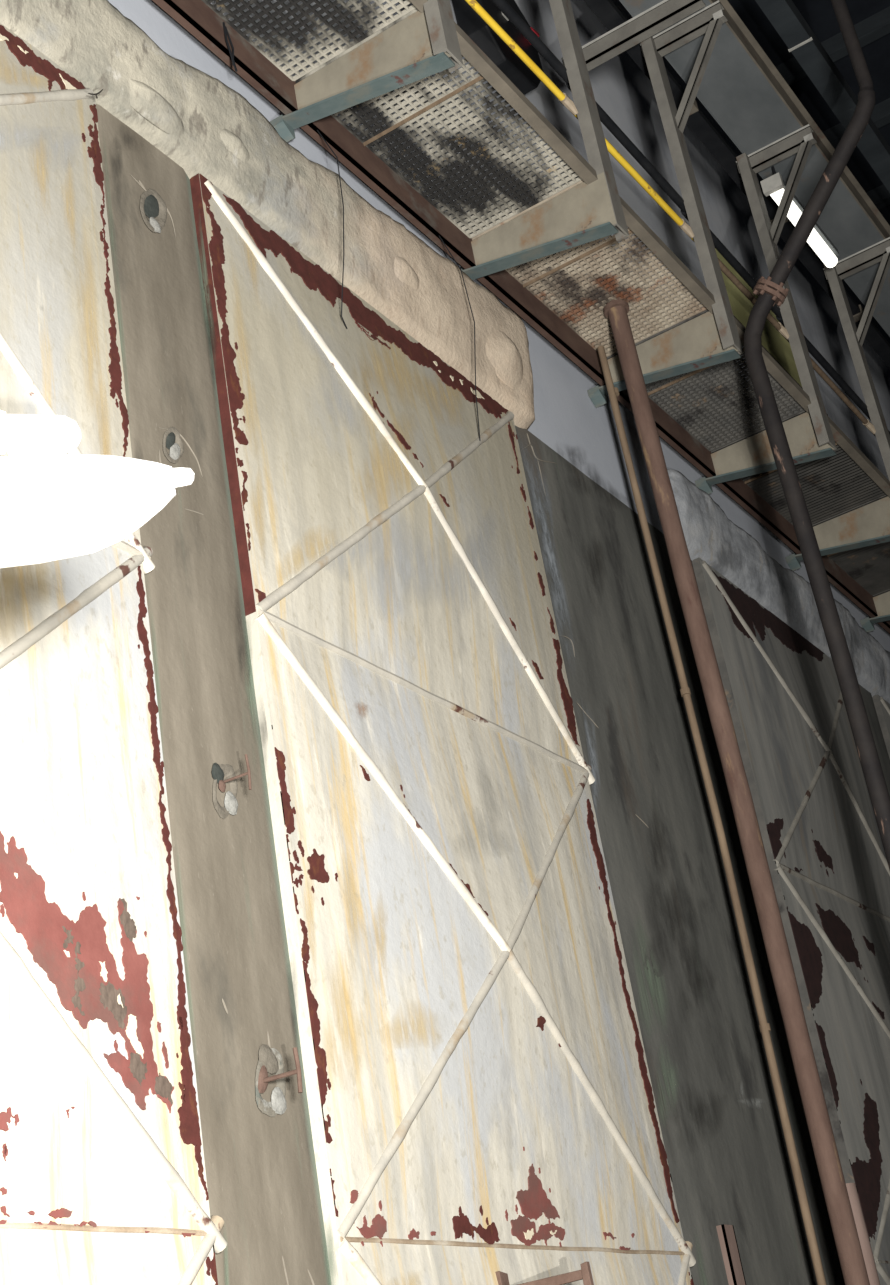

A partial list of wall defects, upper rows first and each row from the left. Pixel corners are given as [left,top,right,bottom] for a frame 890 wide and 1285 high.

peeling [0,25,86,91]
peeling [82,104,129,457]
peeling [199,174,534,551]
peeling [532,551,580,746]
peeling [0,566,209,1201]
peeling [274,747,338,1144]
peeling [766,818,803,874]
peeling [783,895,875,1124]
peeling [330,1168,359,1217]
peeling [354,1200,387,1247]
peeling [452,1147,565,1247]
peeling [849,1079,883,1240]